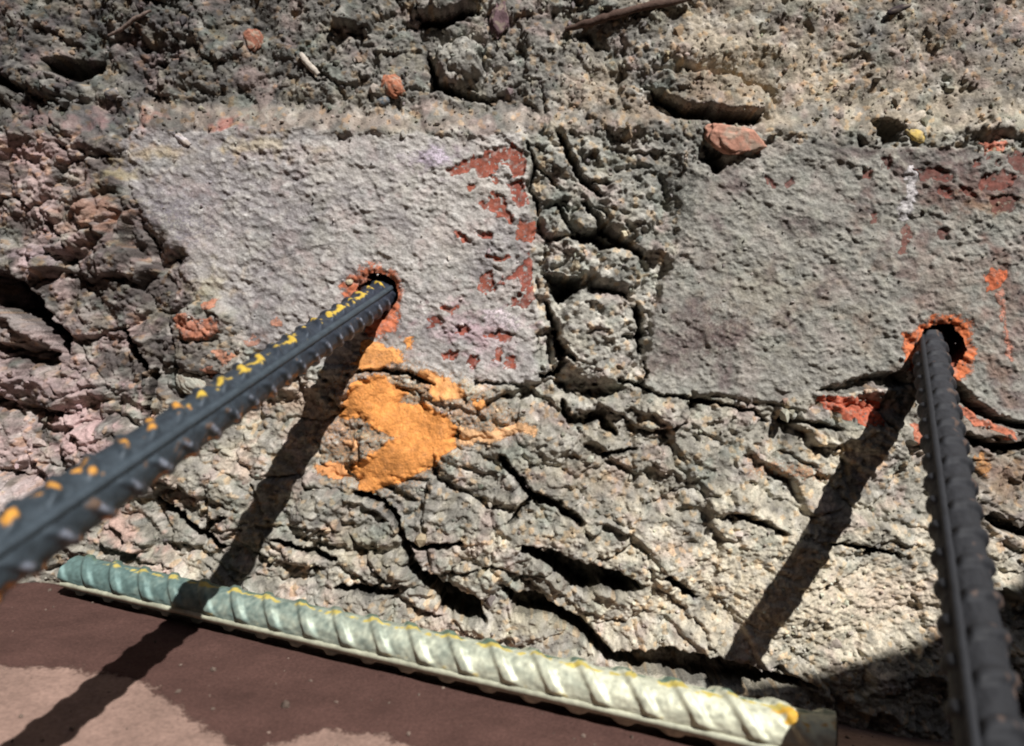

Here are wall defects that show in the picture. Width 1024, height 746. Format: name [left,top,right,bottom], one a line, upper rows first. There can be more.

spalling [173,133,192,147]
peeling [446,142,536,308]
crack [525,132,643,259]
crack [476,301,637,457]
crack [617,304,841,432]
crack [956,386,1024,453]
corrosion [984,267,1013,362]
crack [353,490,463,569]
spalling [0,262,838,746]
crack [498,454,584,527]
crack [735,514,787,537]
spalling [816,313,1024,746]